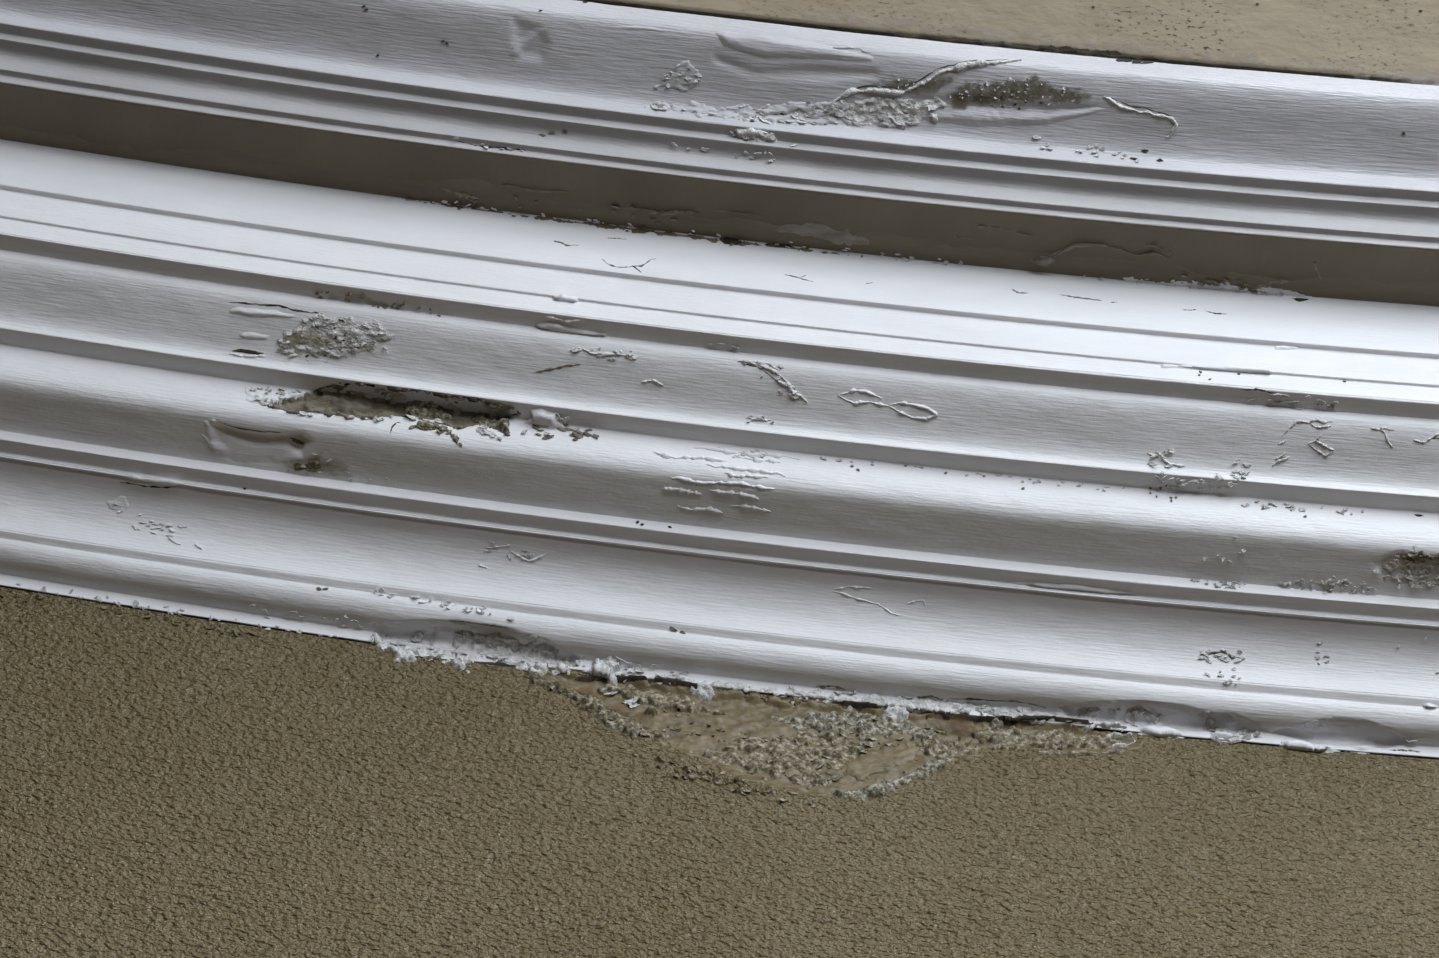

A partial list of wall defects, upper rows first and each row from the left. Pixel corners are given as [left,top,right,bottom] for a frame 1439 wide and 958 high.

peeling [644,59,1106,151]
peeling [1076,144,1163,162]
spalling [245,382,599,447]
crack [739,360,938,420]
crack [1272,418,1334,466]
crack [1371,427,1439,447]
peeling [1275,576,1387,596]
spalling [371,587,1162,808]